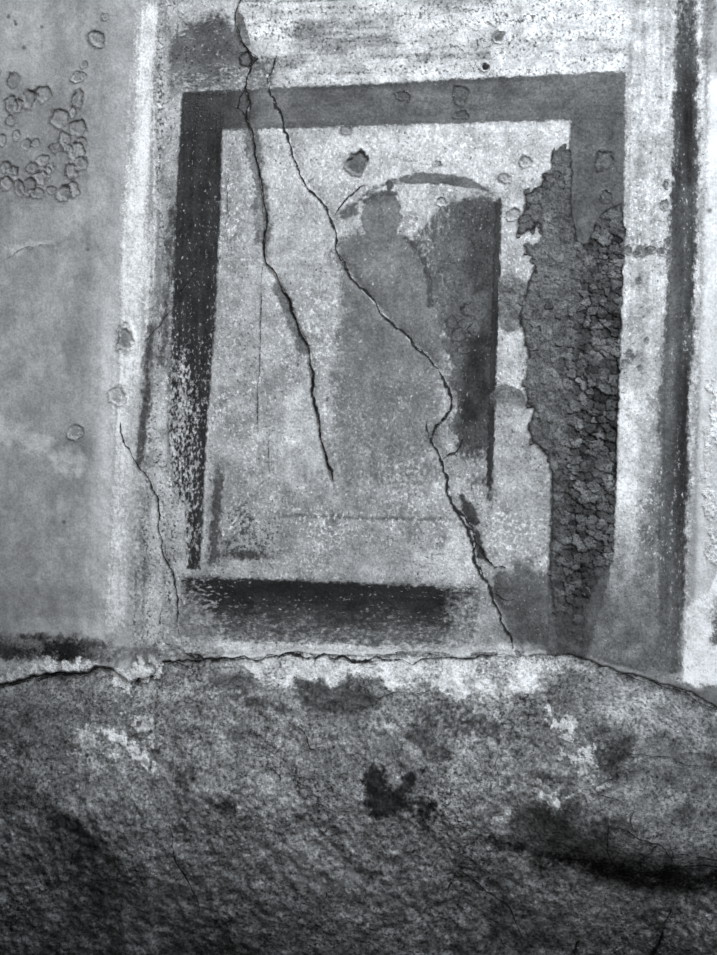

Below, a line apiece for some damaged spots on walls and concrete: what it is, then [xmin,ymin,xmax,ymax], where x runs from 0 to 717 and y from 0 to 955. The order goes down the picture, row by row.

spalling [0,60,89,201]
crack [120,0,514,683]
peeling [489,143,672,638]
leakage [682,378,717,688]
crack [0,665,109,687]
leakage [0,632,717,897]
crack [617,674,717,710]
crack [650,909,671,955]